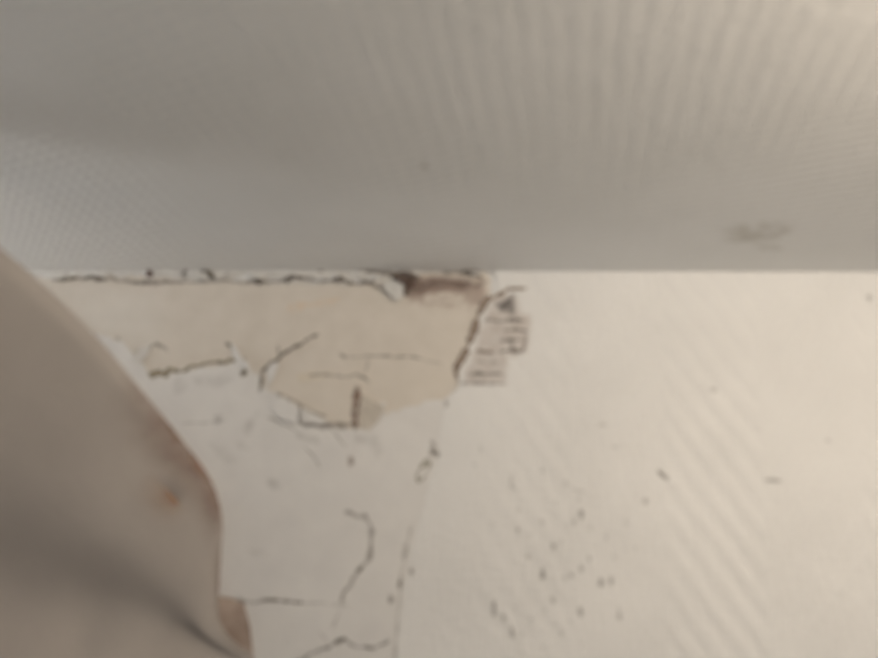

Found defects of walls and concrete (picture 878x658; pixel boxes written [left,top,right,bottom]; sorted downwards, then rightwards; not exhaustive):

crack [55,274,114,282]
crack [136,270,229,283]
crack [253,270,404,285]
crack [149,334,318,390]
crack [308,368,386,429]
peeling [0,248,479,658]